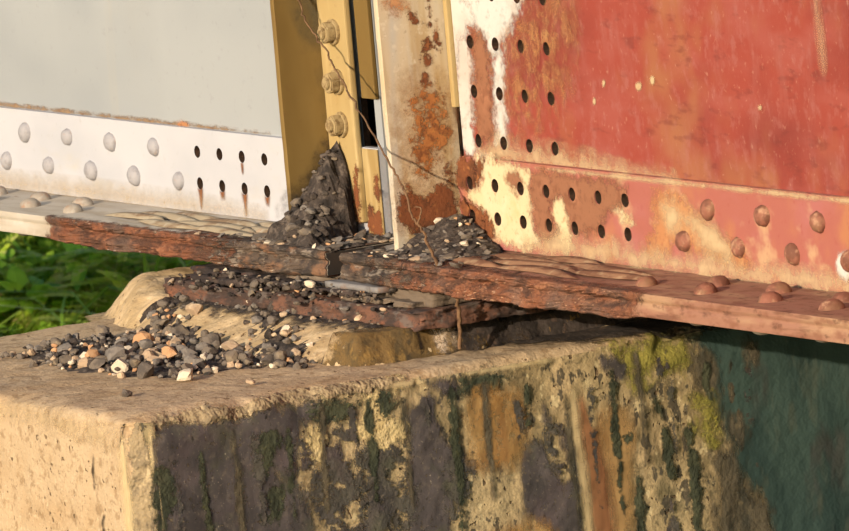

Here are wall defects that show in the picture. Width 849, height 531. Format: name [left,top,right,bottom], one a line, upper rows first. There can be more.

rust [512,23,564,92]
rust [45,215,243,266]
rust [352,164,384,236]
rust [385,0,496,238]
rust [366,255,646,319]
rust [506,168,628,242]
peeling [451,0,849,292]
water stain [149,378,479,531]
water stain [482,383,494,500]
water stain [512,383,583,531]
water stain [587,387,600,483]
water stain [600,350,704,531]